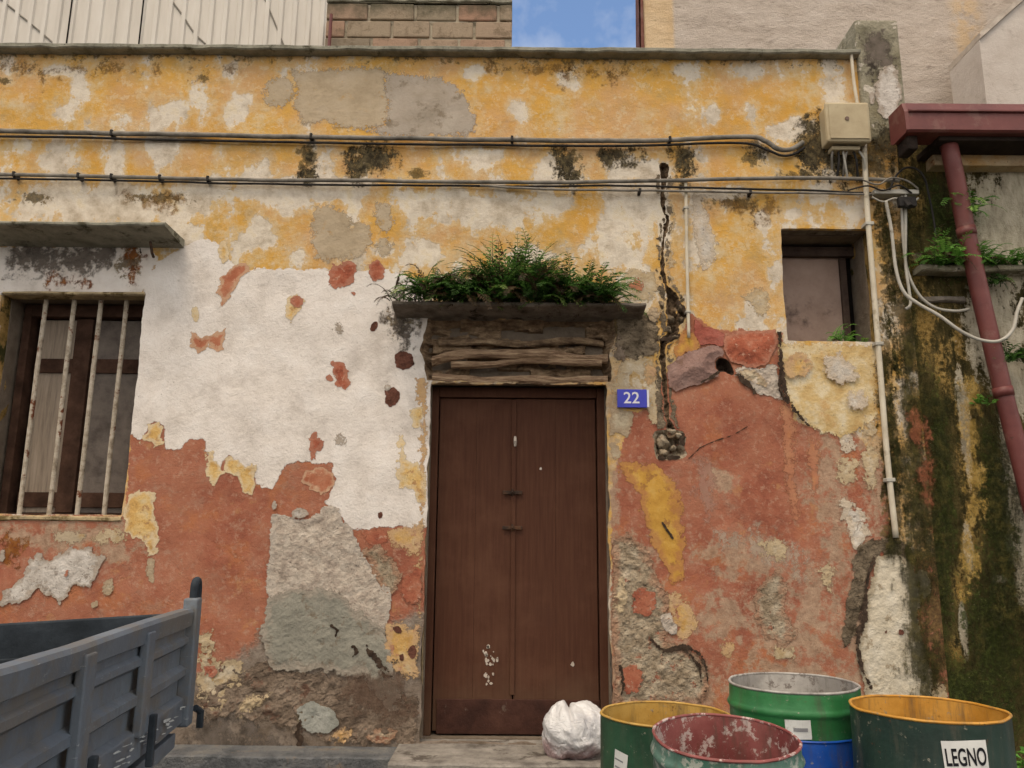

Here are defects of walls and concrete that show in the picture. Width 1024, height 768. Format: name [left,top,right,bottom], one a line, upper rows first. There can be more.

damp [341,141,402,188]
damp [549,147,585,194]
damp [596,147,646,170]
damp [3,246,116,280]
peeling [328,201,396,295]
crack [654,163,748,459]
peeling [0,490,160,608]
spalling [265,351,429,680]
spalling [609,268,709,705]
spalling [194,628,419,747]
crack [649,638,709,692]
crack [855,556,876,689]